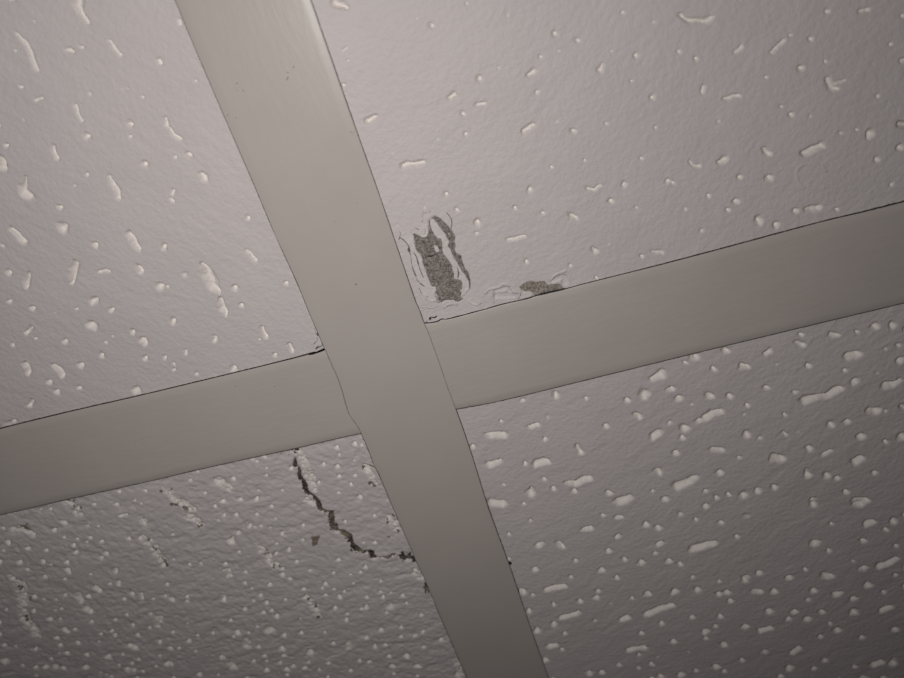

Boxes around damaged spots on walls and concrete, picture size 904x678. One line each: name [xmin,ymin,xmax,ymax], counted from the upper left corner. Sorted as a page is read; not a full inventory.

crack [0,0,467,678]
peeling [398,210,481,322]
spalling [518,281,564,299]